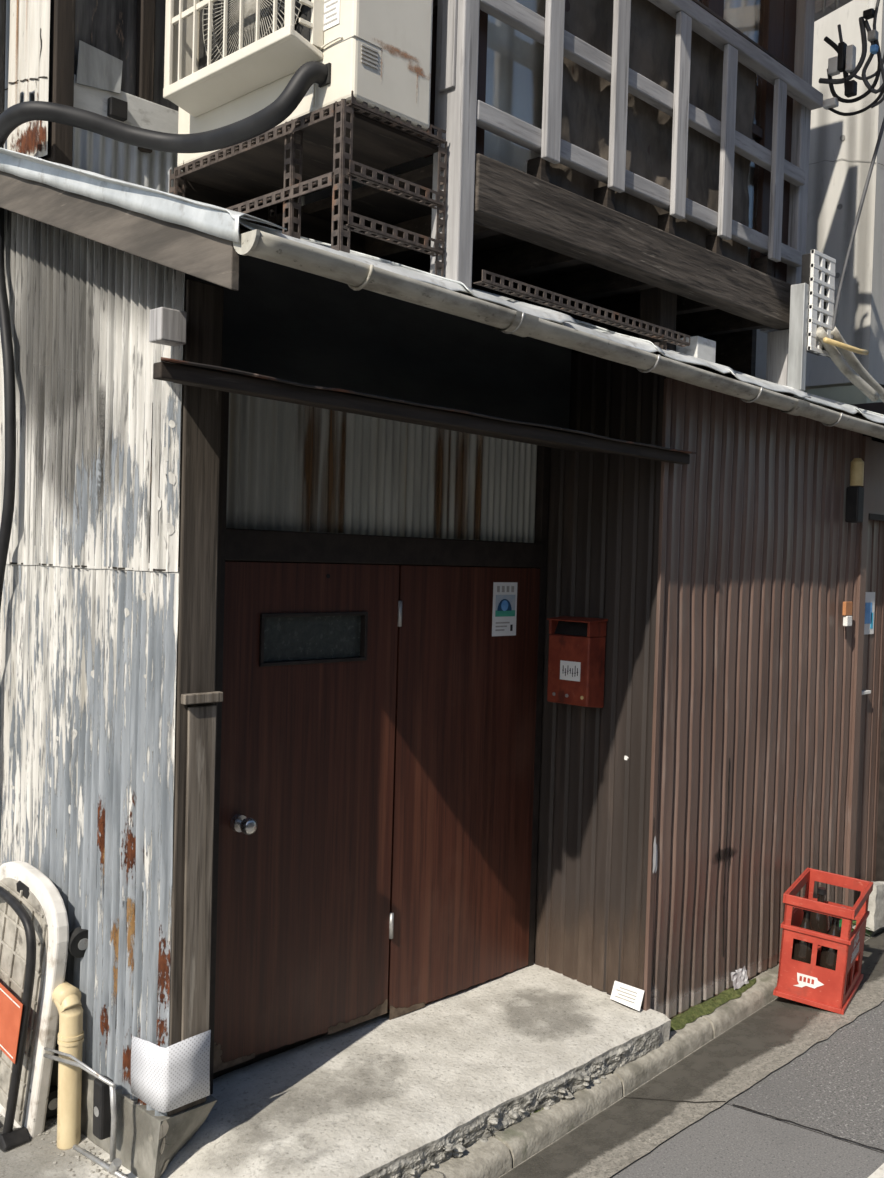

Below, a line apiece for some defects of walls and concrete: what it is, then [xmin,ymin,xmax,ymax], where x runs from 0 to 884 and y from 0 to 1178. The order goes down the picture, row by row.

leakage [20,220,116,483]
peeling [0,387,181,1174]
corrosion [97,795,105,882]
corrosion [121,790,147,880]
corrosion [100,898,135,1047]
corrosion [156,925,170,1046]
leakage [857,929,884,990]
corrosion [122,1043,132,1085]
spalling [365,1029,660,1178]
leakage [500,997,824,1178]